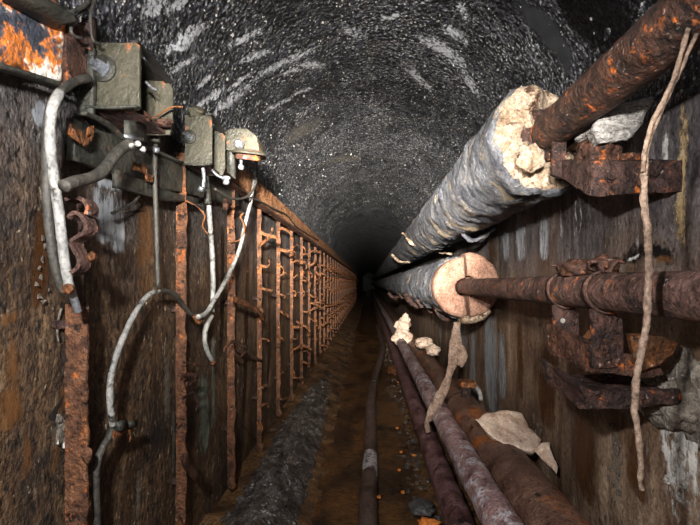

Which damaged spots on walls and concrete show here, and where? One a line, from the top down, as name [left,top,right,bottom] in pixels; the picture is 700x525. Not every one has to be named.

rust [538,347,554,426]
rust [575,409,595,505]
rust [627,436,648,503]